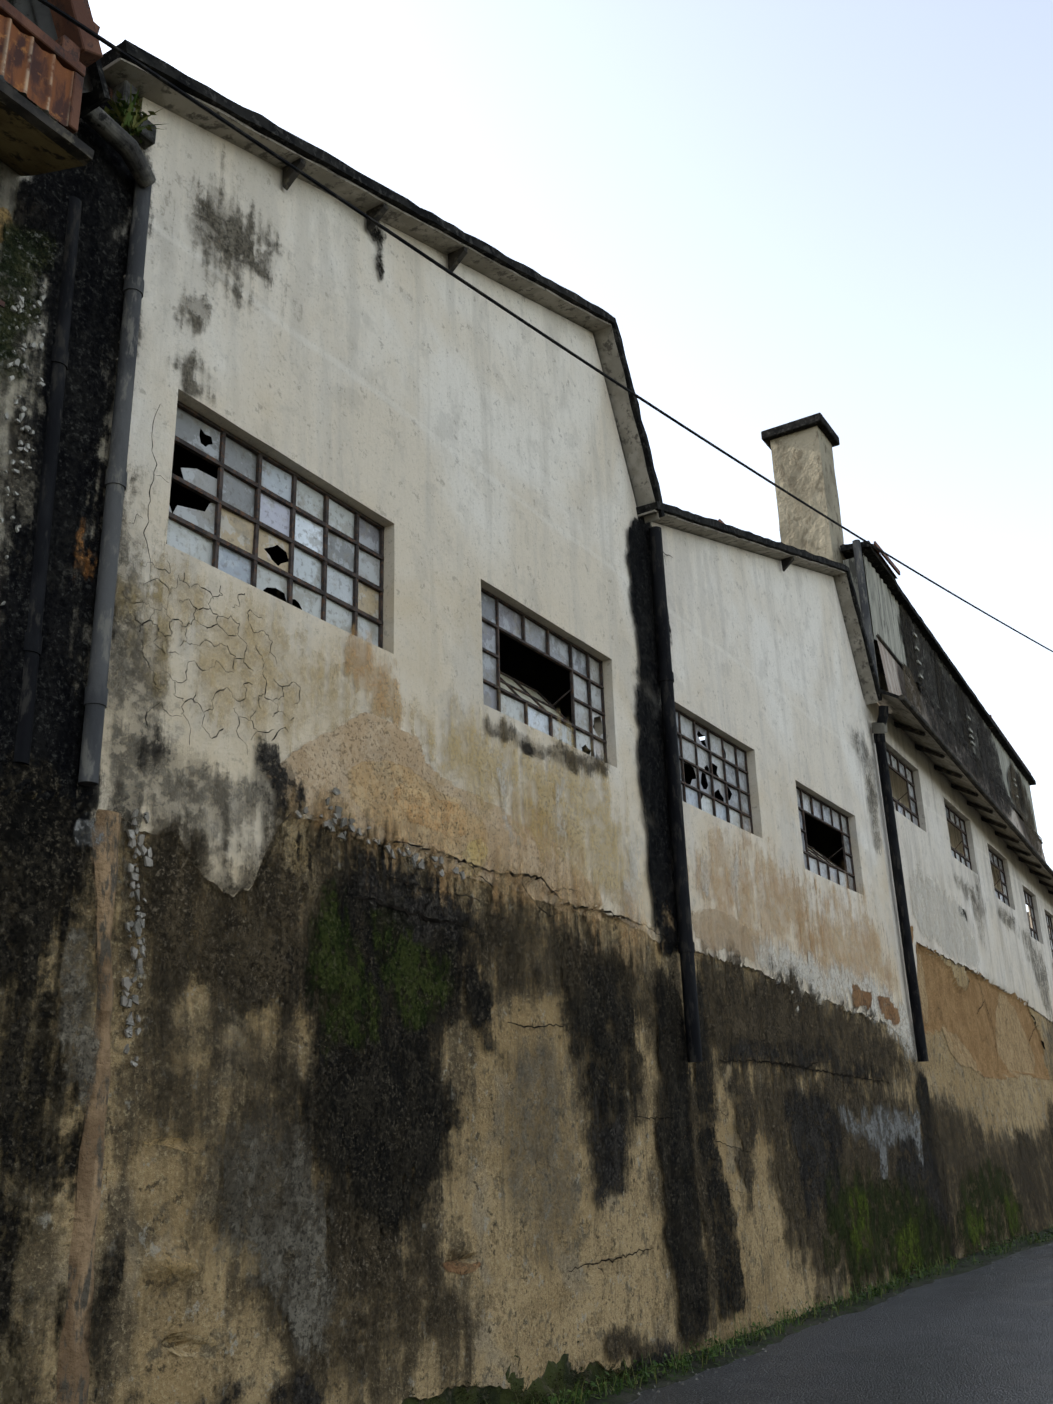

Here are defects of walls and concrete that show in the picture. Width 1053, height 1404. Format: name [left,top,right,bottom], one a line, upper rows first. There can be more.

spalling [0,207,13,243]
flaking render [3,285,46,497]
mould [175,294,215,399]
mould [194,178,281,307]
crack [122,405,301,755]
damp [627,517,646,602]
peeling [267,712,602,921]
mould [899,604,1042,856]
damp [0,642,97,1404]
mould [256,736,508,1282]
damp [428,700,759,1350]
damp [753,937,917,1062]